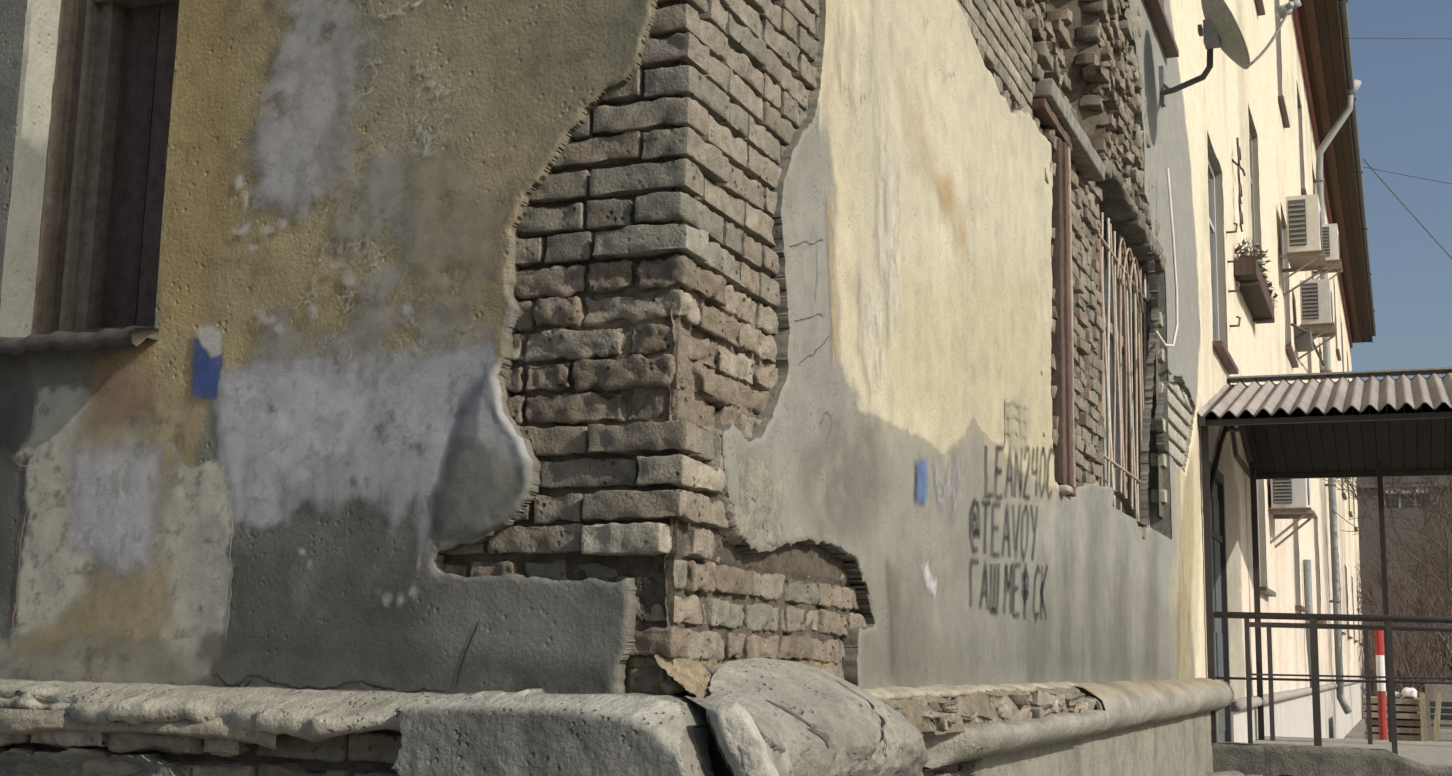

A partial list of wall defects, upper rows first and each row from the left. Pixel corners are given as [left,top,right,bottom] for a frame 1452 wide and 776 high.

peeling [0,325,233,686]
peeling [235,0,505,390]
spalling [443,0,867,698]
crack [766,699,830,748]
crack [836,680,887,759]
spalling [881,687,1098,733]